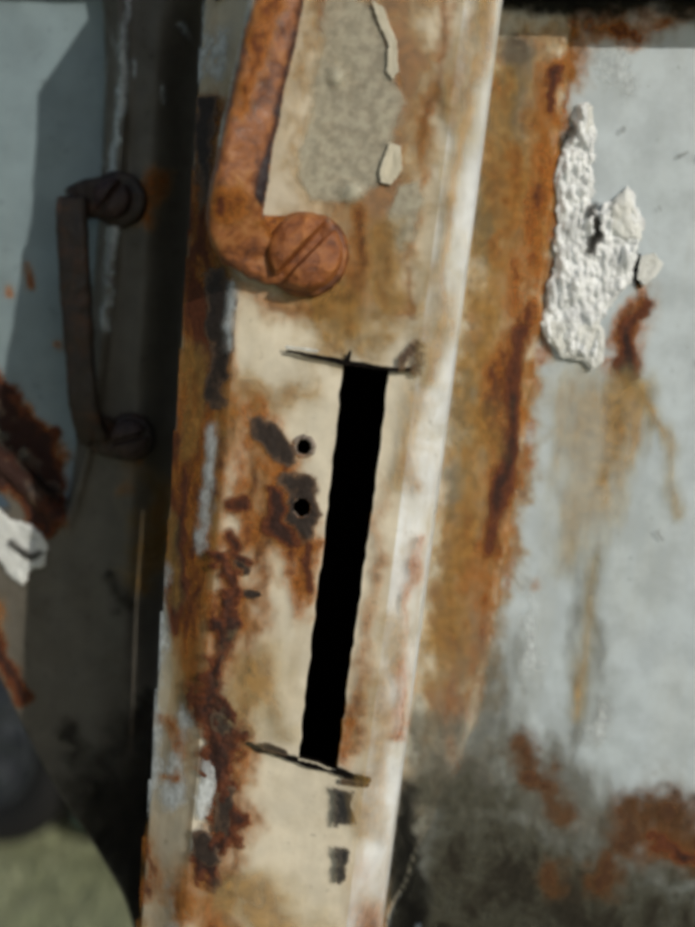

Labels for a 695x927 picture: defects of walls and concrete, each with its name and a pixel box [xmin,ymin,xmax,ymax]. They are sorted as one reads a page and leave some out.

corrosion [256,0,448,352]
peeling [300,0,422,244]
peeling [540,102,663,371]
corrosion [424,0,695,726]
peeling [0,494,49,586]
corrosion [0,374,67,539]
corrosion [164,150,324,927]
corrosion [0,631,35,708]
corrosion [140,840,161,903]
corrosion [511,734,575,826]
corrosion [585,784,695,896]